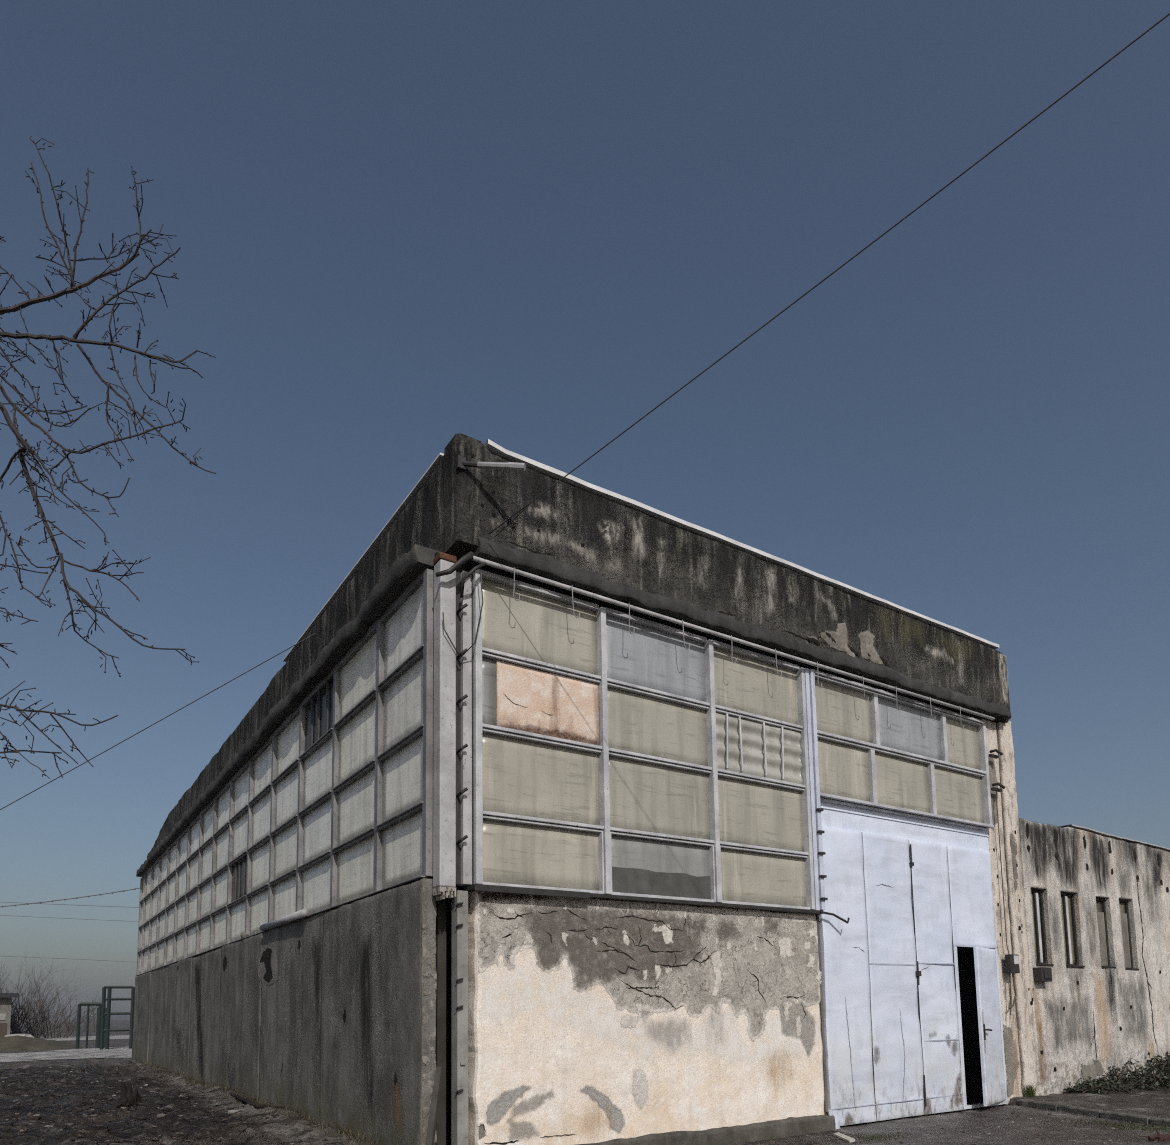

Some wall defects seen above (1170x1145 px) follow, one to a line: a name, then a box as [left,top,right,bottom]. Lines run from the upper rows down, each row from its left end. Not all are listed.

spalling [807,623,891,668]
rust [524,726,597,742]
leakage [1020,824,1163,908]
leakage [195,966,203,1076]
leakage [360,944,370,1044]
crack [491,909,715,1009]
peeling [478,891,822,1056]
crack [752,974,806,1019]
leakage [1050,976,1087,1045]
leakage [1106,969,1144,1033]
peeling [479,1086,552,1139]
peeling [581,1086,624,1132]